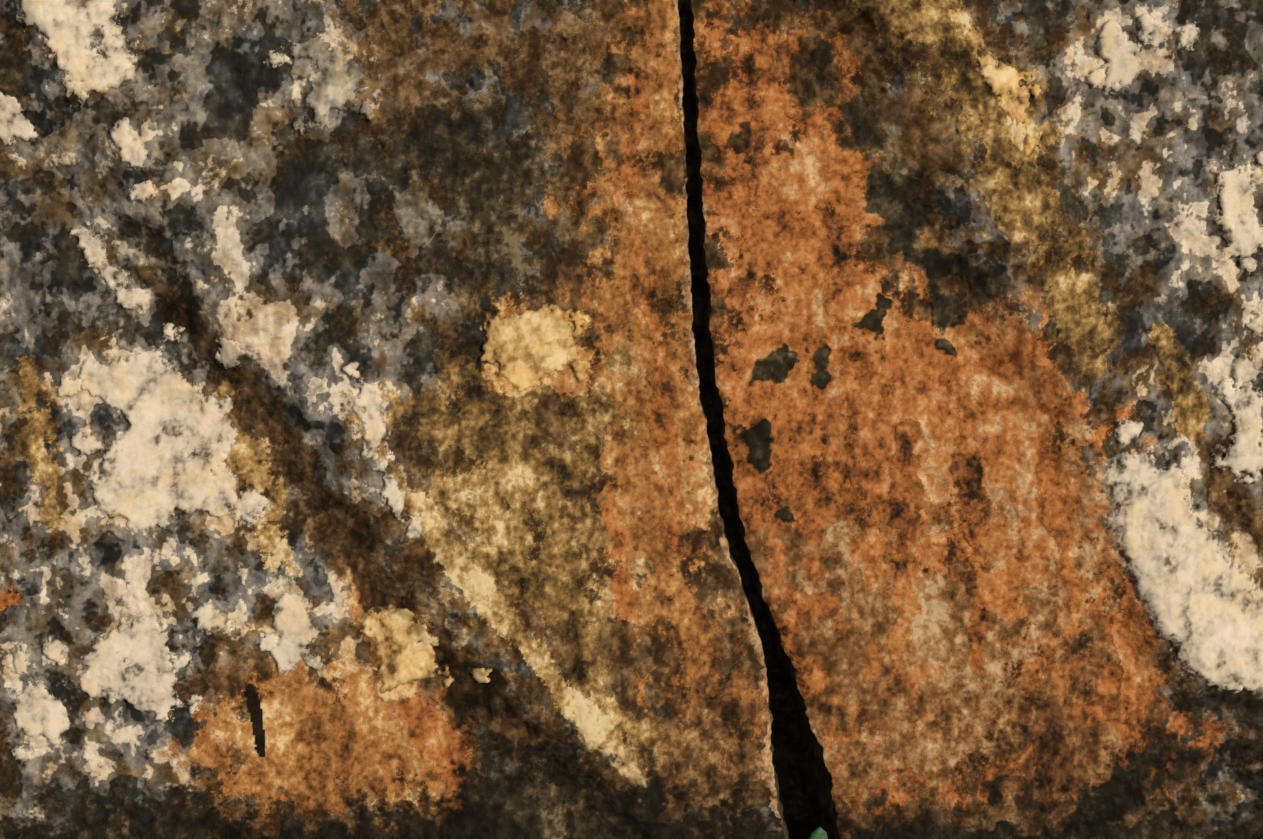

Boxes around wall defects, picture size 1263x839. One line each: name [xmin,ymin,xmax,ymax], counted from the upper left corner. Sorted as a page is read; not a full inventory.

rust [163,567,484,831]
crack [672,0,841,839]
rust [544,0,1244,831]